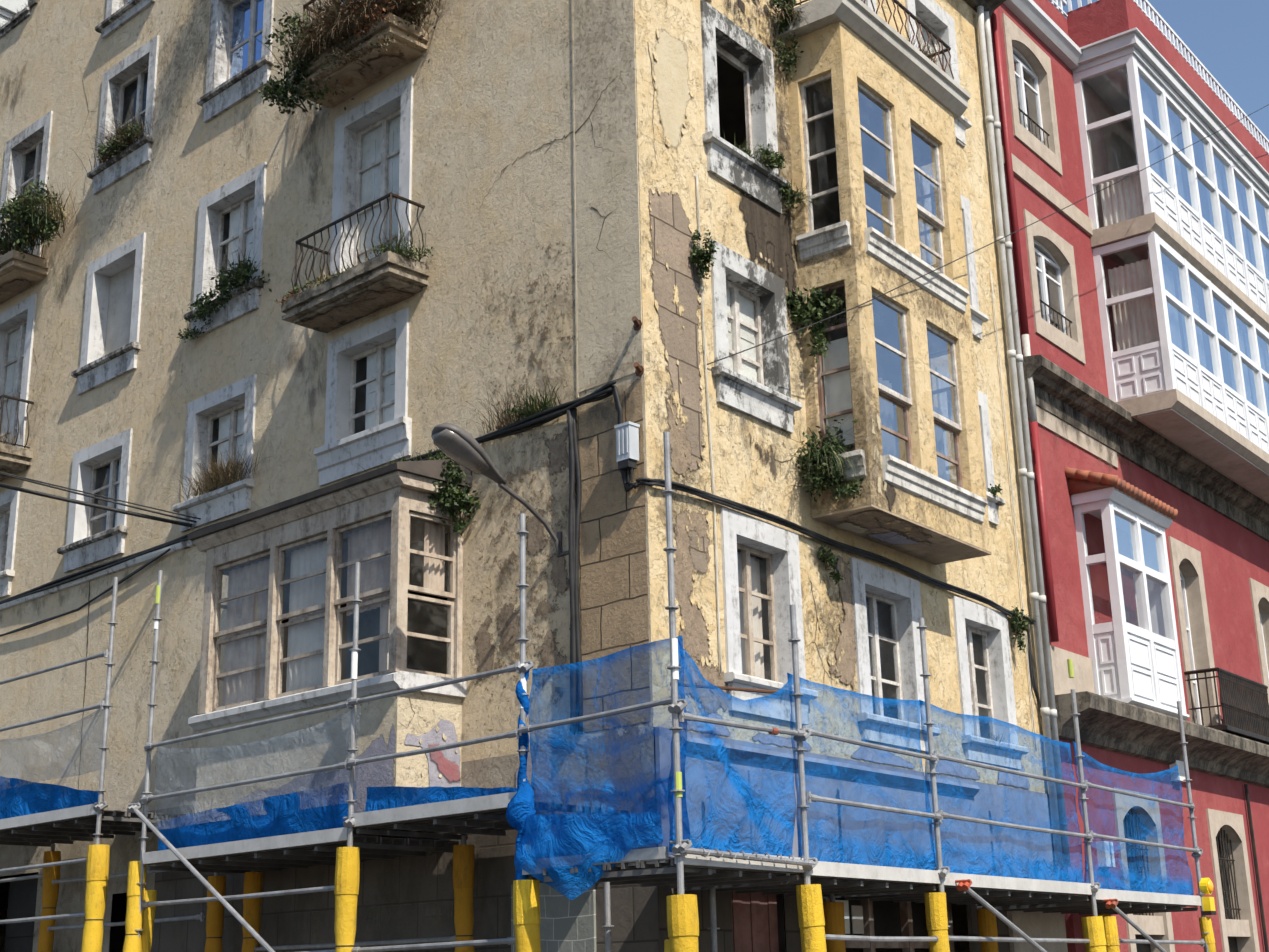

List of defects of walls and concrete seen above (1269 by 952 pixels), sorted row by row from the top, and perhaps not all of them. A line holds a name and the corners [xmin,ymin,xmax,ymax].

peeling [729,0,777,49]
crack [481,78,615,206]
crack [648,45,657,161]
crack [591,207,616,258]
flaking render [648,187,706,483]
flaking render [673,509,746,737]
crack [805,580,835,702]
peeling [235,719,461,813]
flaking render [752,733,812,751]
flaking render [851,746,915,768]
flaking render [997,766,1030,789]